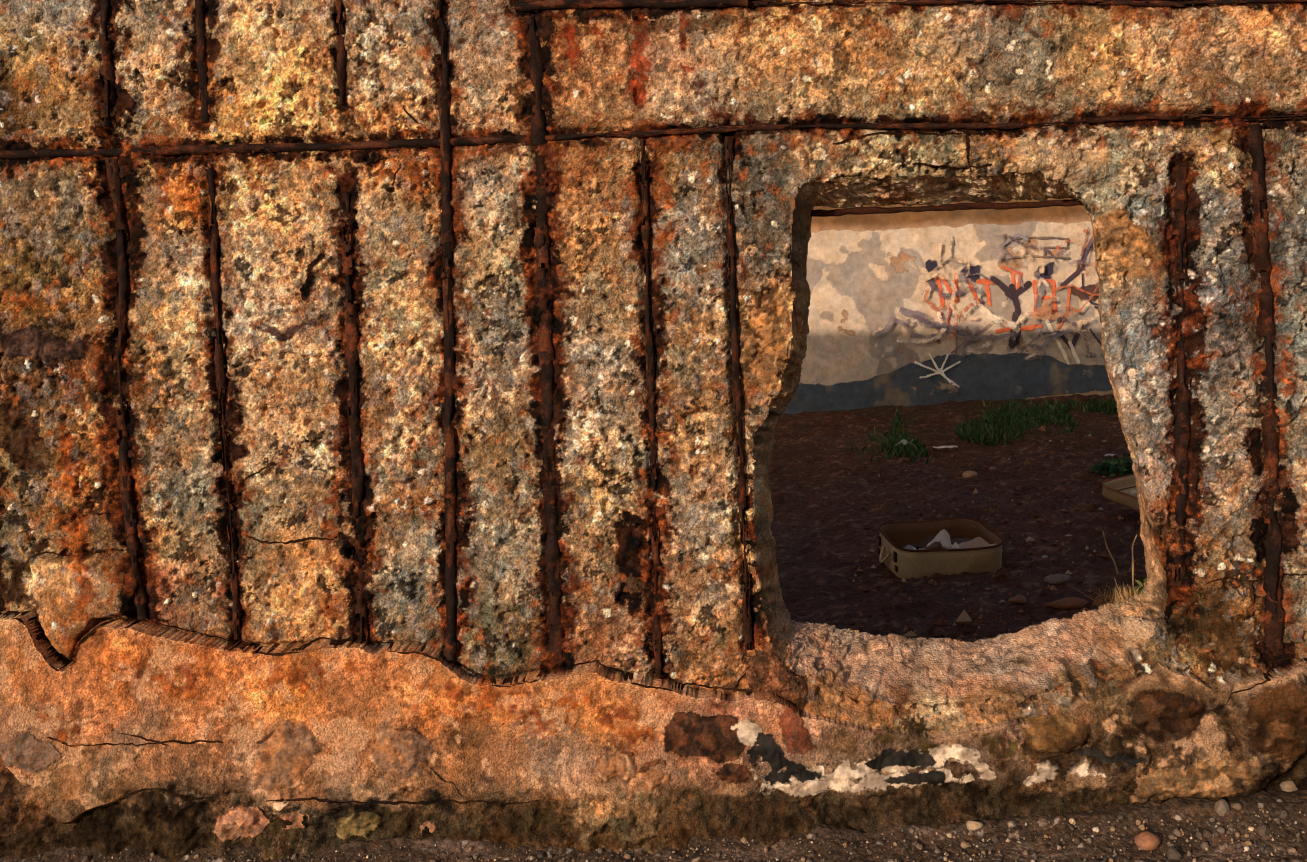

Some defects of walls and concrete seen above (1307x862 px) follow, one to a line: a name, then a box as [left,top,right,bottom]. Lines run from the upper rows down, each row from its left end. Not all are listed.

spalling [0,0,531,149]
spalling [540,5,1307,133]
corrosion [0,0,1307,684]
spalling [0,128,786,698]
water stain [0,783,213,862]
crack [47,733,223,747]
corrosion [134,658,209,700]
crack [0,610,753,696]
water stain [315,788,464,843]
crack [266,768,539,807]
corrosion [444,677,653,751]
water stain [899,721,1156,826]